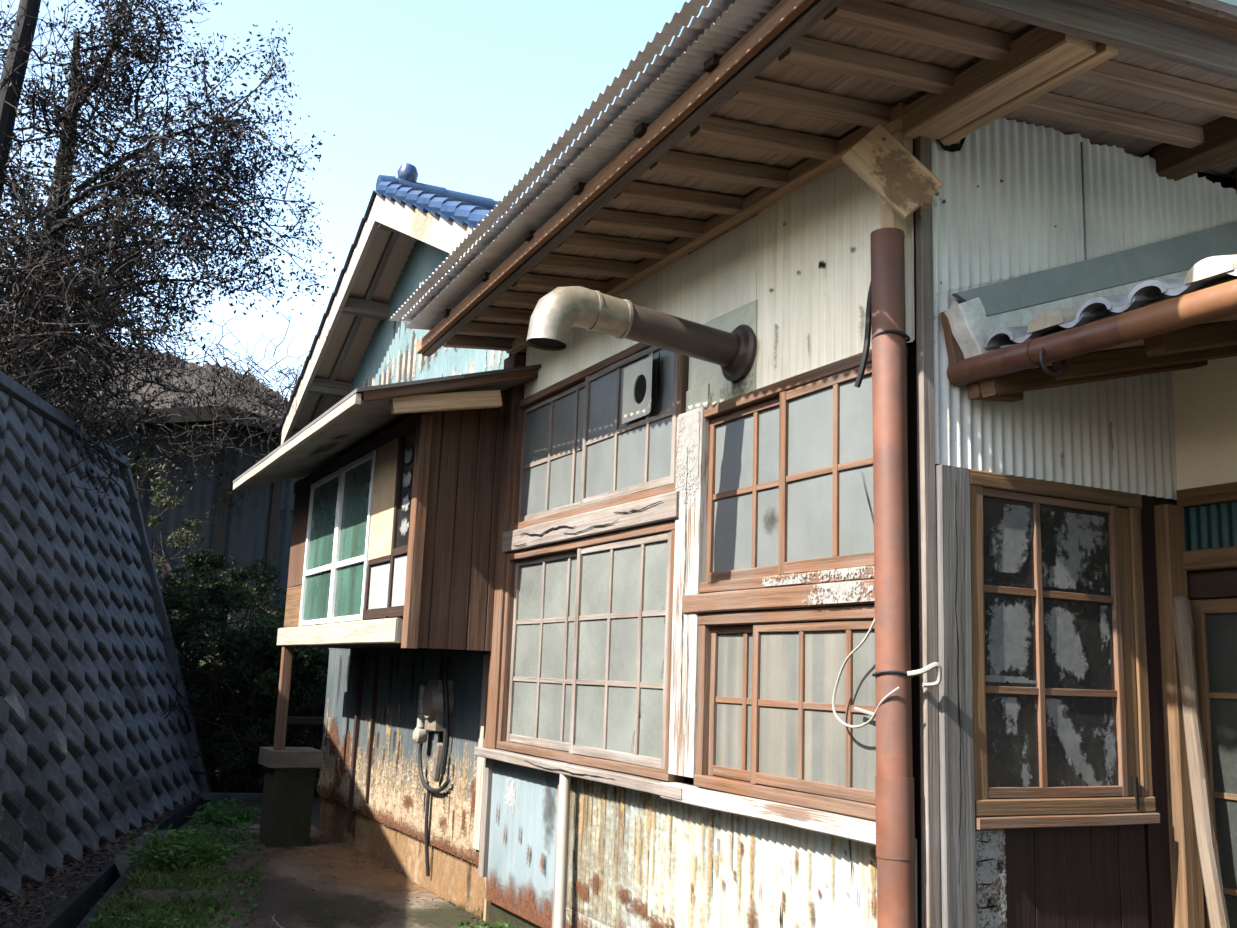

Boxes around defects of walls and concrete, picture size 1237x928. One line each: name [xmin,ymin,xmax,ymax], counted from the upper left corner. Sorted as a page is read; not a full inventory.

peeling [762,565,875,605]
rust [317,700,761,928]
rust [782,835,877,927]